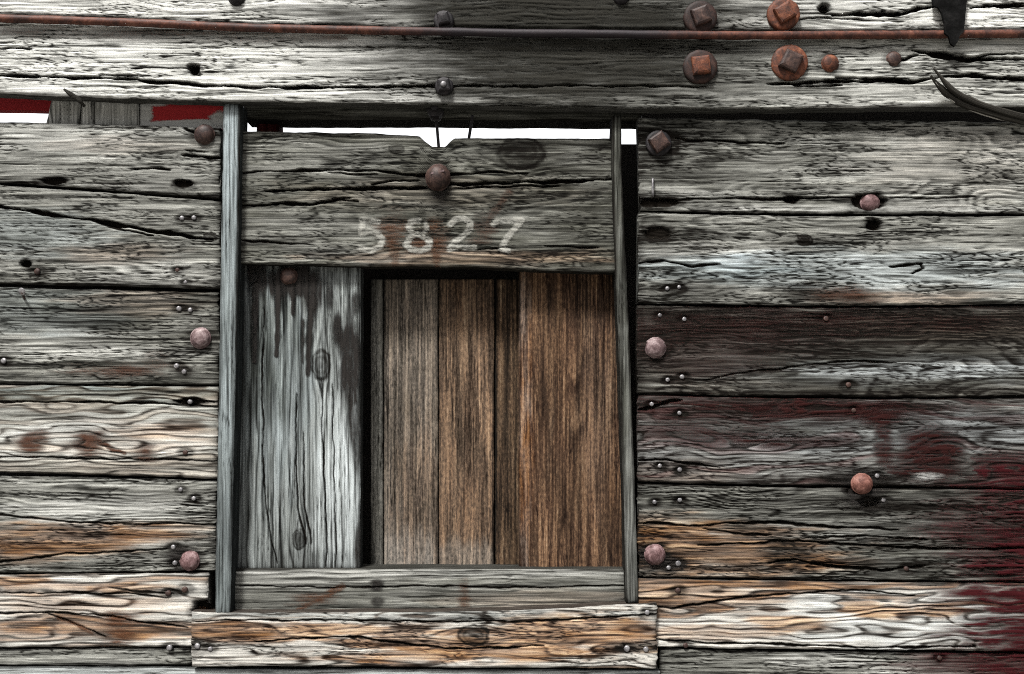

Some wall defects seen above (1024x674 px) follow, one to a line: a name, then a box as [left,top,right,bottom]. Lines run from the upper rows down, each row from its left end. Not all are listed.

crack [768,51,1024,87]
peeling [140,104,223,129]
crack [0,205,214,241]
leakage [247,266,322,376]